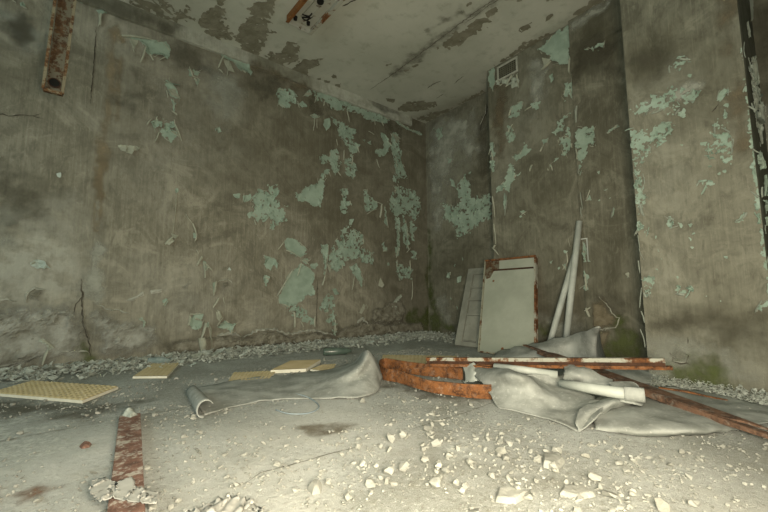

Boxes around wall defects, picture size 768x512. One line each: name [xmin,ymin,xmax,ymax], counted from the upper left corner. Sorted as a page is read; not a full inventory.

crack [89,31,97,103]
peeling [147,78,182,143]
peeling [122,0,323,75]
peeling [437,7,498,50]
peeling [386,22,596,255]
peeling [696,88,734,195]
peeling [734,0,768,313]
spalling [0,88,456,384]
peeling [607,86,701,347]
crack [74,280,91,356]